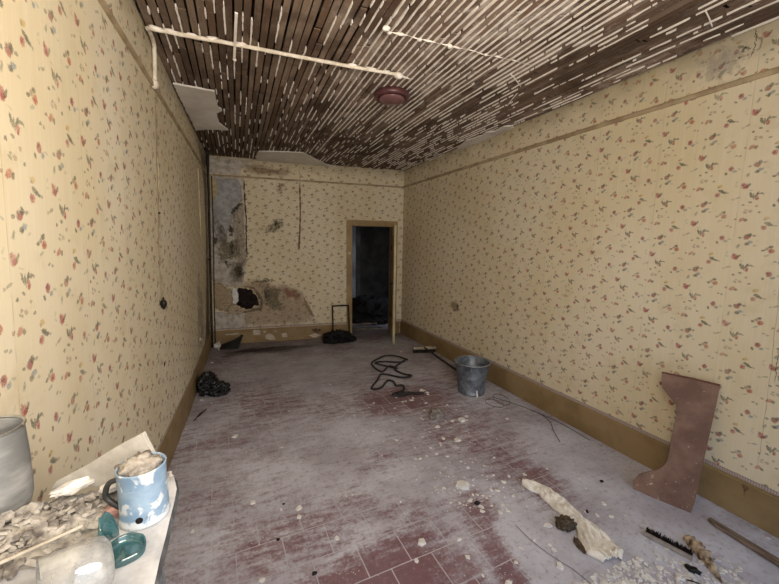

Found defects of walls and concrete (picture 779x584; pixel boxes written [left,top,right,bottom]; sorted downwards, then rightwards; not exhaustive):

spalling [173,82,228,131]
spalling [255,151,336,167]
water stain [202,157,243,281]
flaking render [213,179,242,240]
spalling [232,288,262,312]